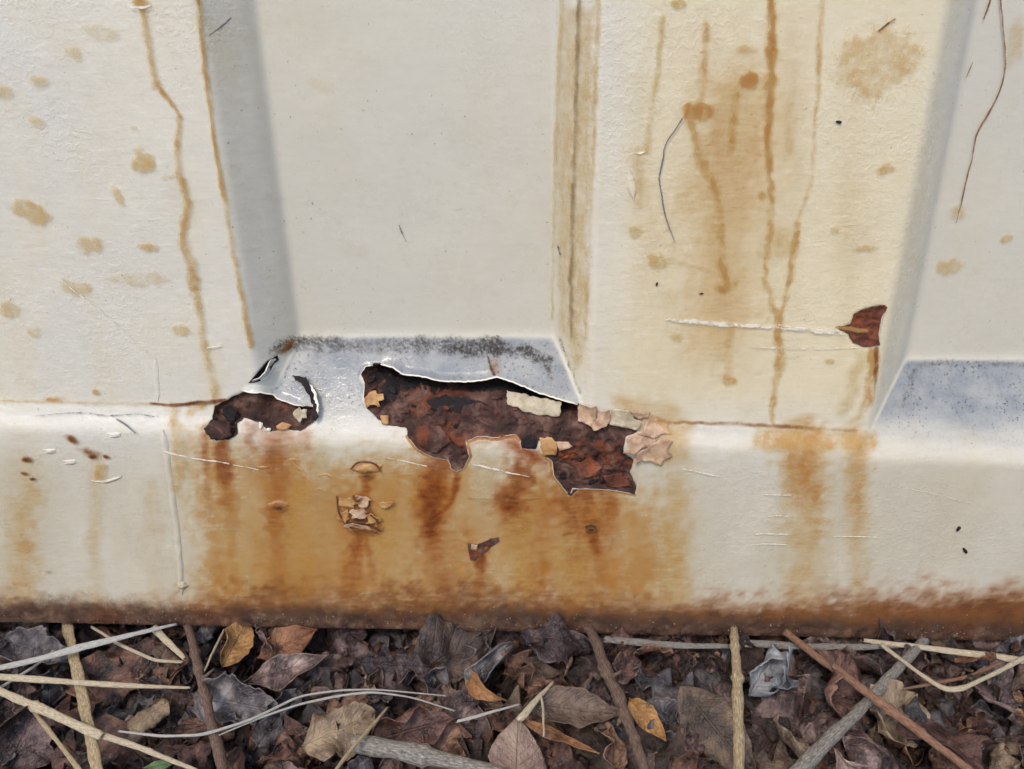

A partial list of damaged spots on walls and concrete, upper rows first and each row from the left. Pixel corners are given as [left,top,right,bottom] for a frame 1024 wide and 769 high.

corrosion [132,0,182,152]
corrosion [197,0,226,201]
corrosion [735,0,777,203]
corrosion [176,168,202,314]
corrosion [67,435,109,459]
peeling [204,356,319,441]
peeling [357,355,673,498]
corrosion [746,395,876,534]
peeling [836,305,889,347]
corrosion [865,347,879,403]
peeling [467,537,500,562]
corrosion [0,440,1024,641]